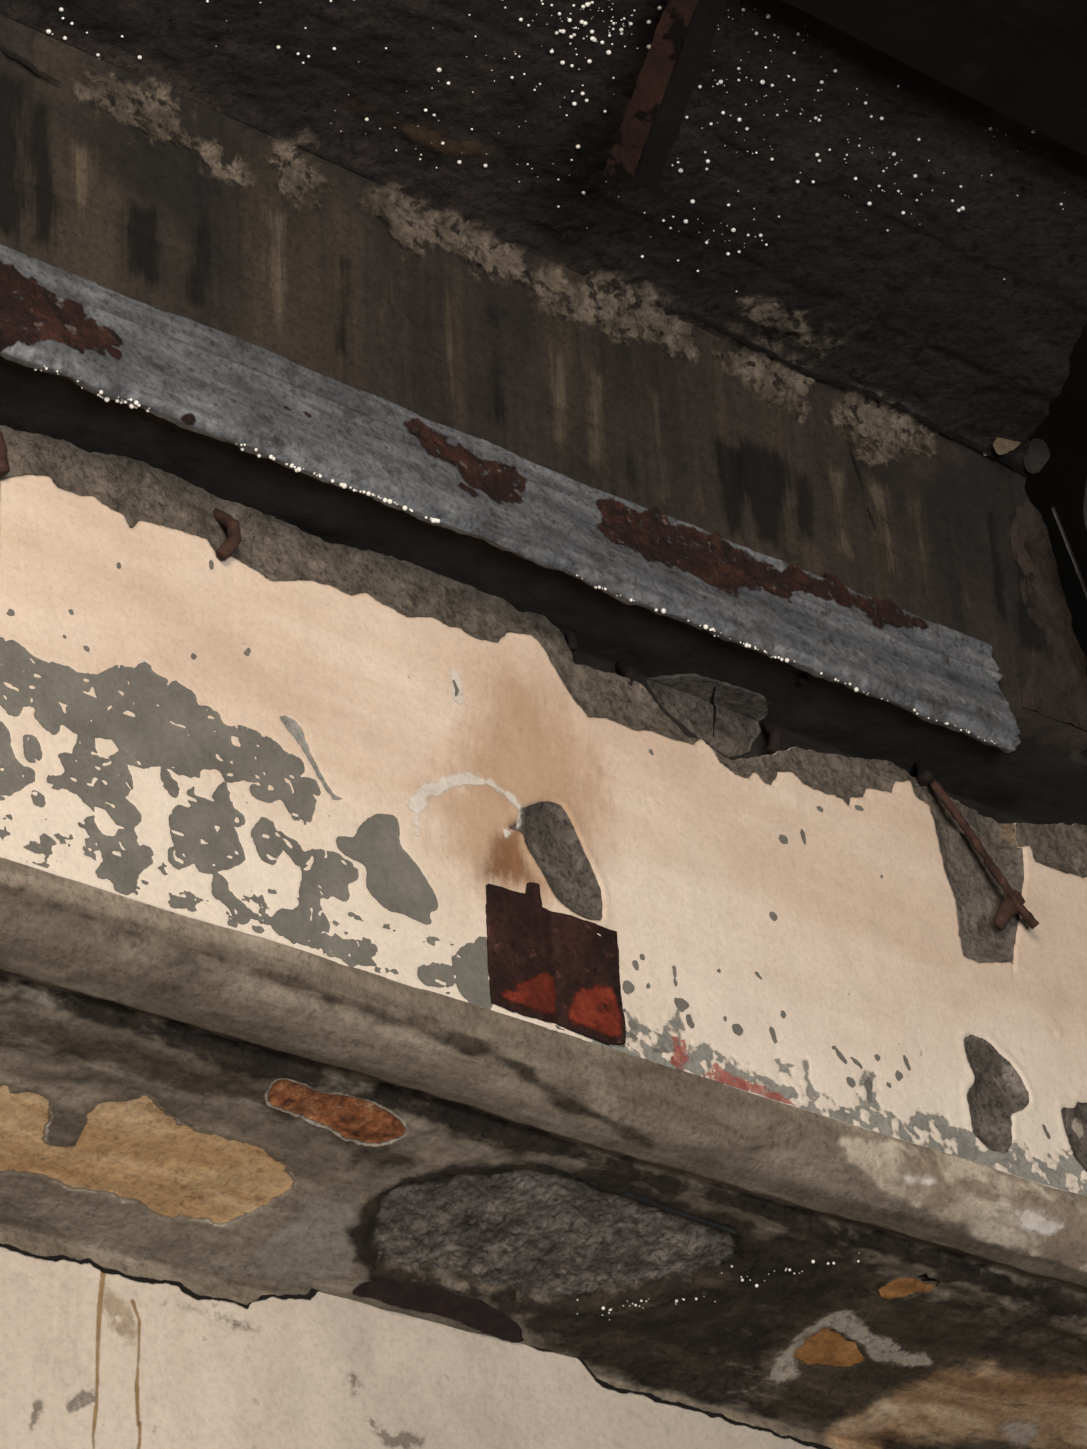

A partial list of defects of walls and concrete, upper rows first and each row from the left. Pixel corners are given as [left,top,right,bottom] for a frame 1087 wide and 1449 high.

damp [72,71,253,185]
damp [263,131,330,328]
rust [0,261,122,359]
rust [404,418,526,504]
rust [597,498,928,629]
spalling [0,425,1087,1013]
peeling [593,954,1087,1196]
flaking render [0,1085,297,1227]
damp [0,975,1087,1430]
spalling [347,1162,760,1317]
crack [0,1243,832,1449]
damp [866,1432,1081,1449]